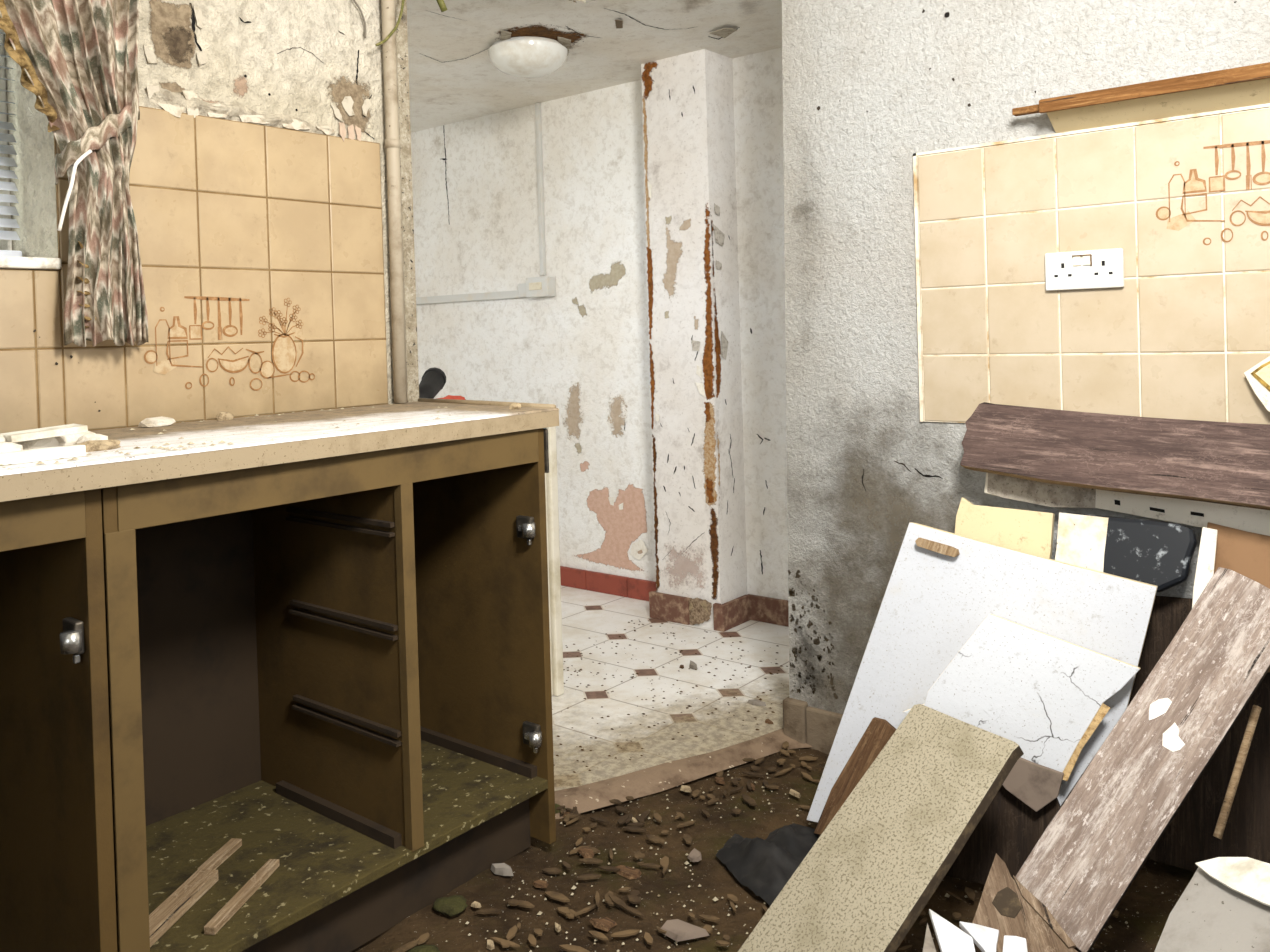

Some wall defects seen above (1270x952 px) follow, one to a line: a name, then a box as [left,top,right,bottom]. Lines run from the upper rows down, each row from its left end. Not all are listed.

flaking render [143,0,208,69]
crack [566,8,740,40]
peeling [144,50,374,142]
peeling [589,262,626,292]
peeling [662,216,691,318]
corrosion [641,62,660,592]
peeling [608,393,627,437]
corrosion [692,203,728,600]
peeling [574,484,648,571]
flaking render [666,513,712,625]
leakage [788,442,959,711]